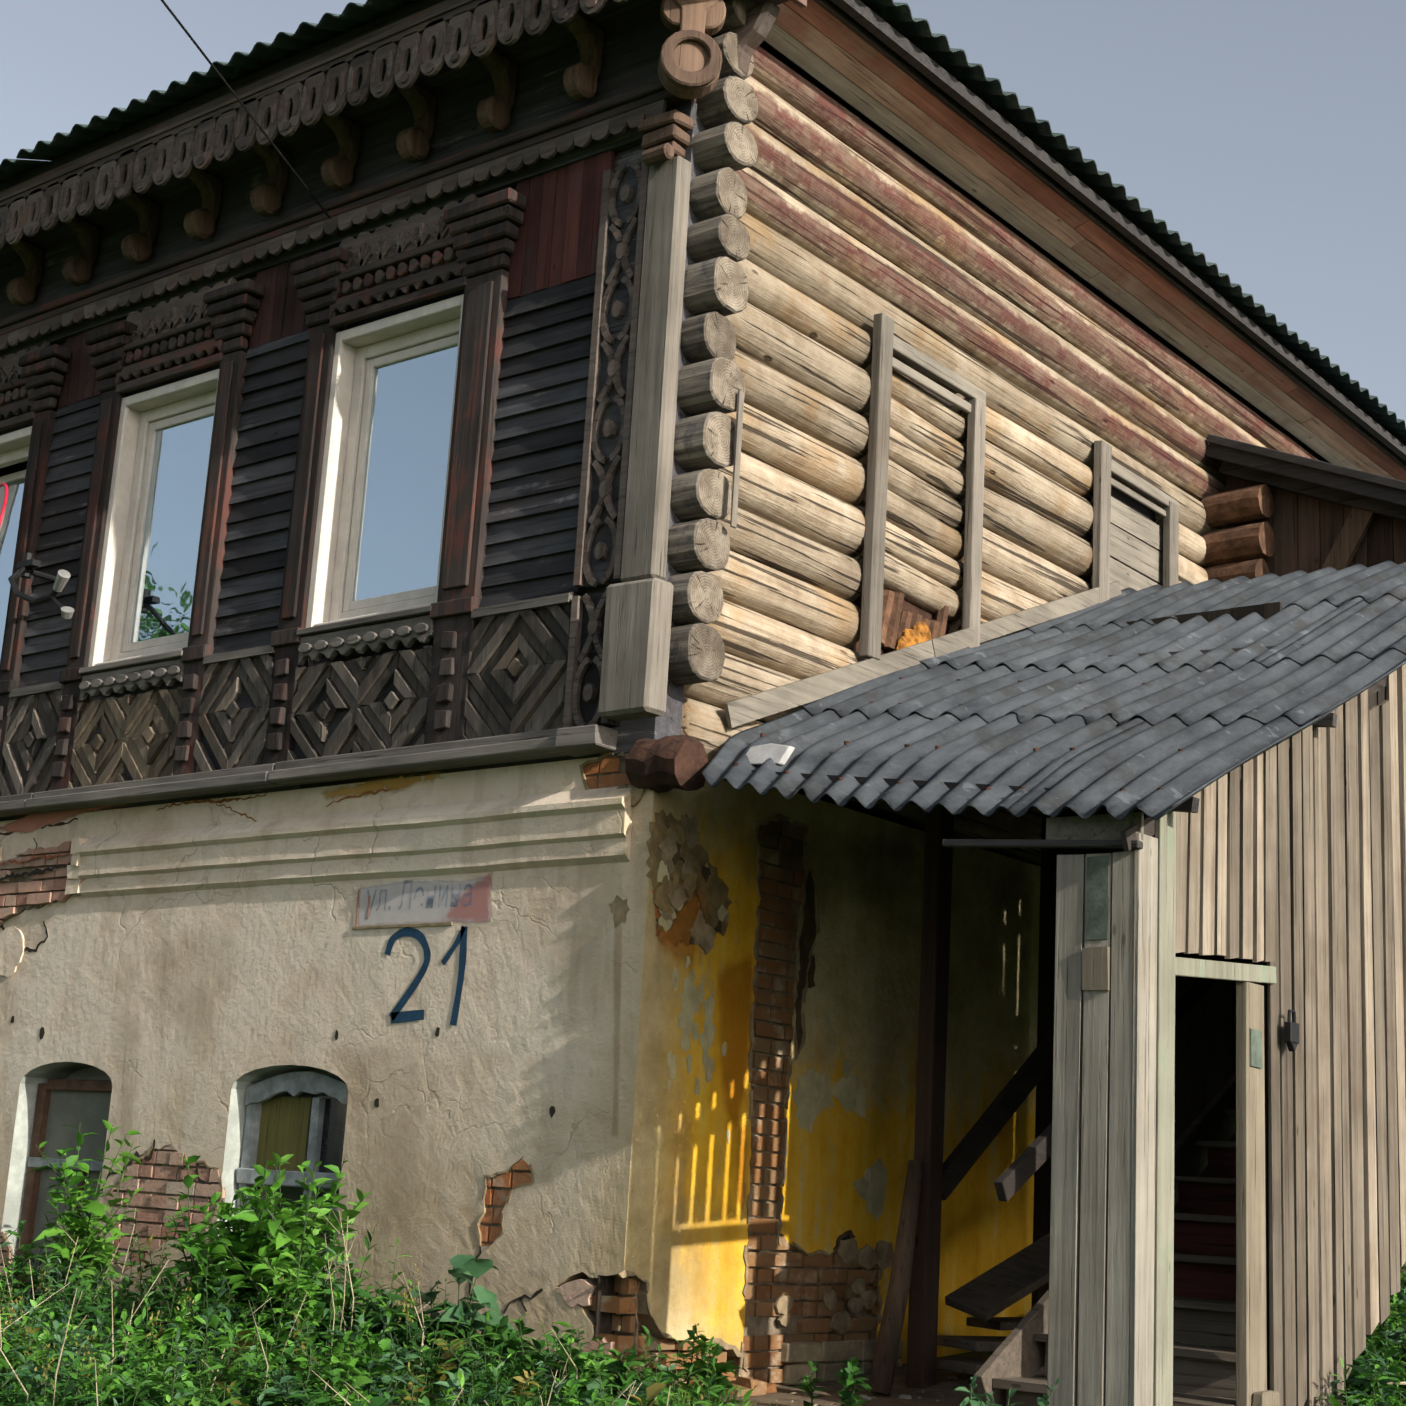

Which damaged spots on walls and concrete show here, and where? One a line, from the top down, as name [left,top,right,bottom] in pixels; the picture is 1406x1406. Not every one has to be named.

spalling [579,752,646,807]
spalling [0,804,126,928]
spalling [556,809,894,1400]
spalling [105,1139,226,1271]
spalling [474,1156,535,1259]